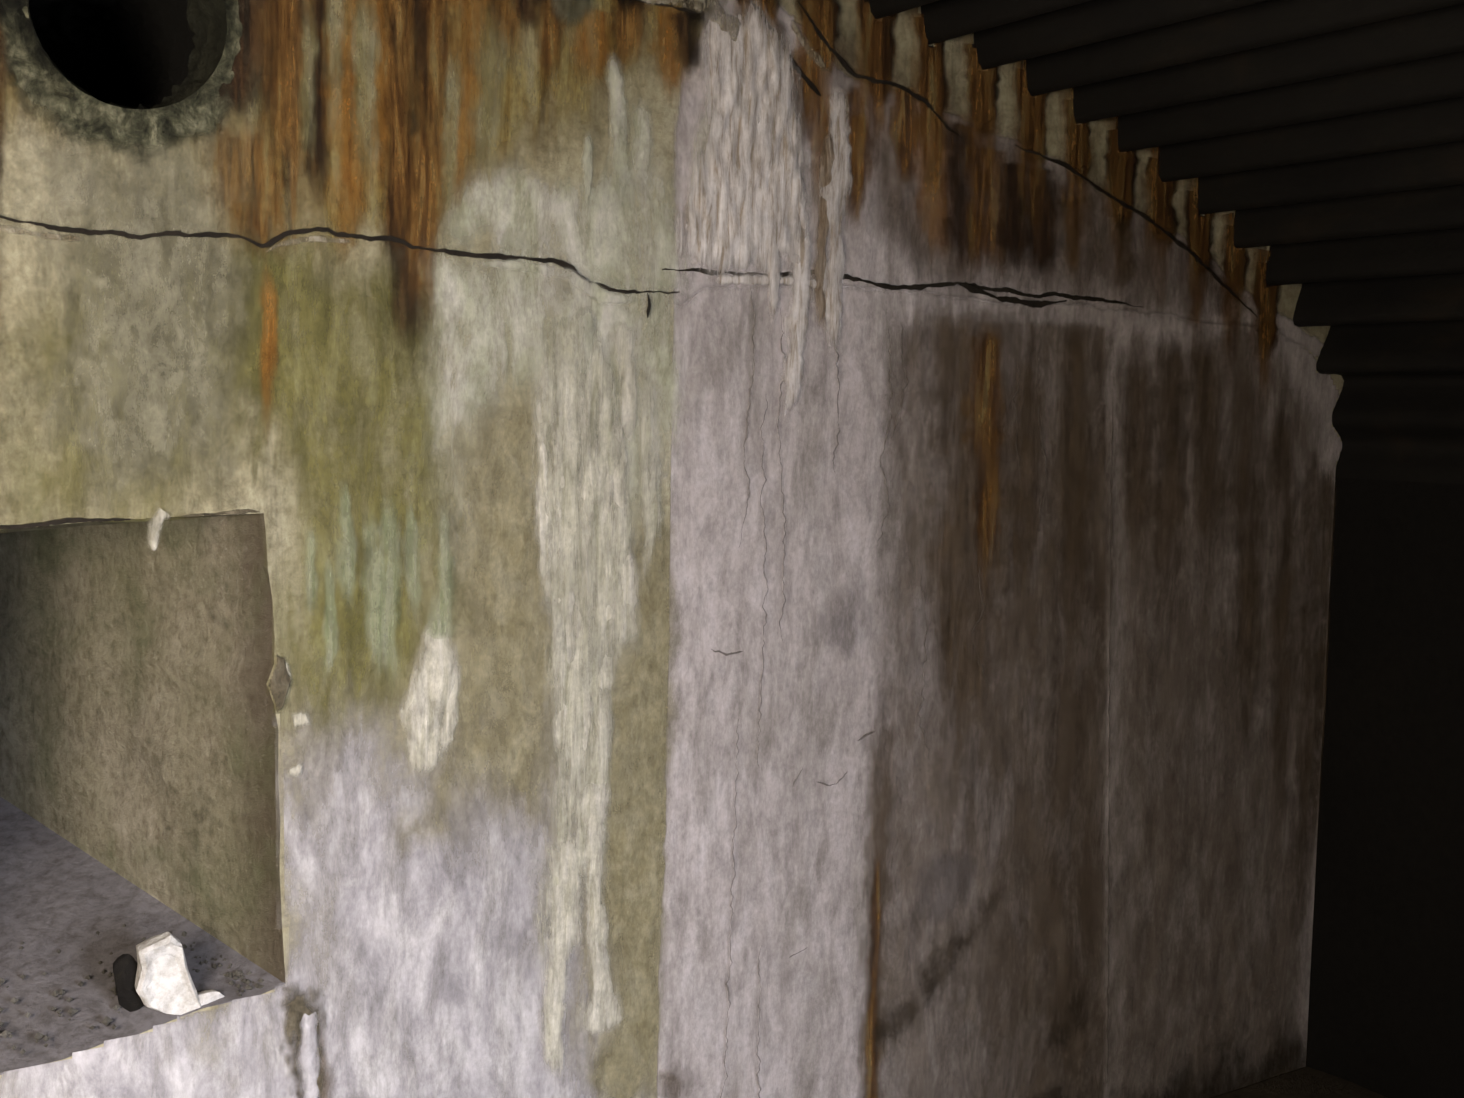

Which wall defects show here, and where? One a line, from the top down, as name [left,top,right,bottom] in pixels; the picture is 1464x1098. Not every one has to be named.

corrosion [262,284,276,387]
water stain [302,0,375,144]
corrosion [212,0,712,335]
crack [748,0,961,138]
corrosion [736,0,1279,380]
crack [1015,145,1258,318]
water stain [422,0,852,1069]
water stain [401,621,458,771]
crack [0,215,1144,1098]
corrosion [862,872,885,1098]